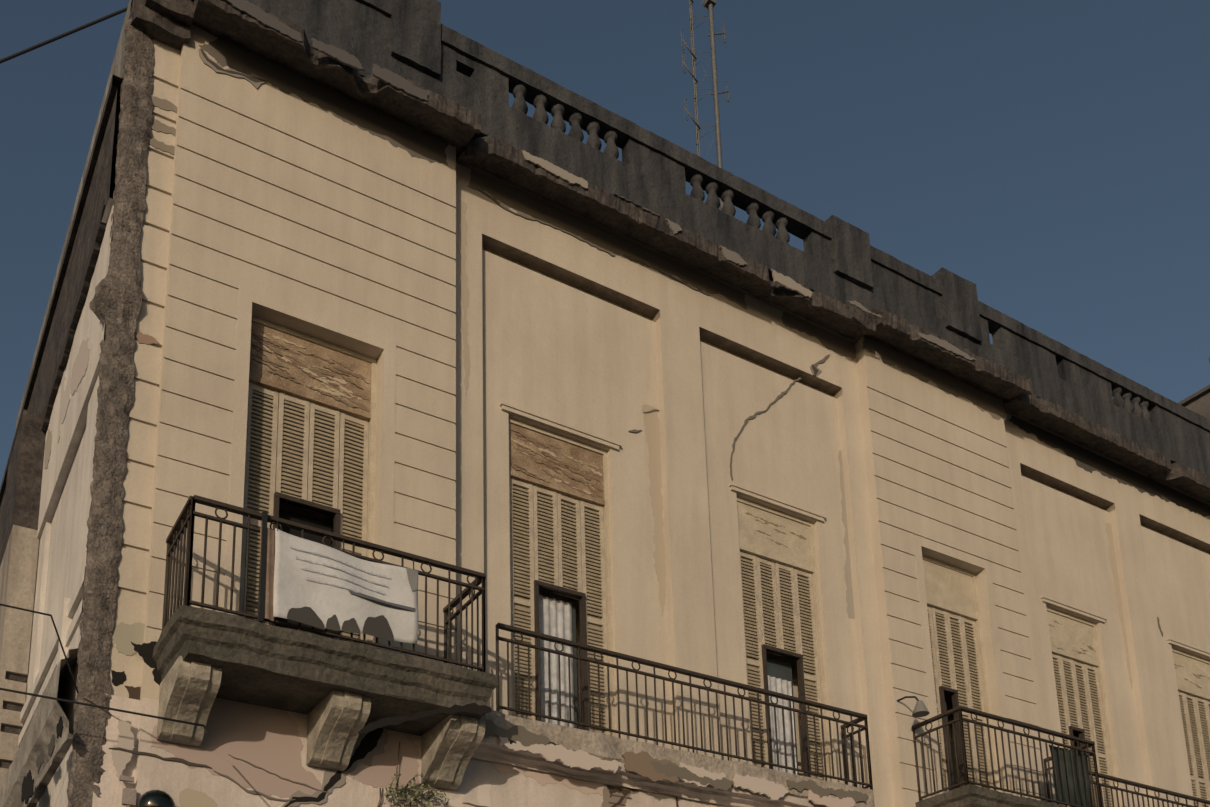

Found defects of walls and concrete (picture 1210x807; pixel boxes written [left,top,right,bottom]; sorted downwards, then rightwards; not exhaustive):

spalling [199,48,266,89]
peeling [223,0,429,101]
spalling [62,18,177,807]
peeling [252,333,369,412]
crack [730,354,830,481]
peeling [150,698,420,807]
crack [109,703,492,807]
peeling [491,737,793,807]
peeling [808,790,855,807]